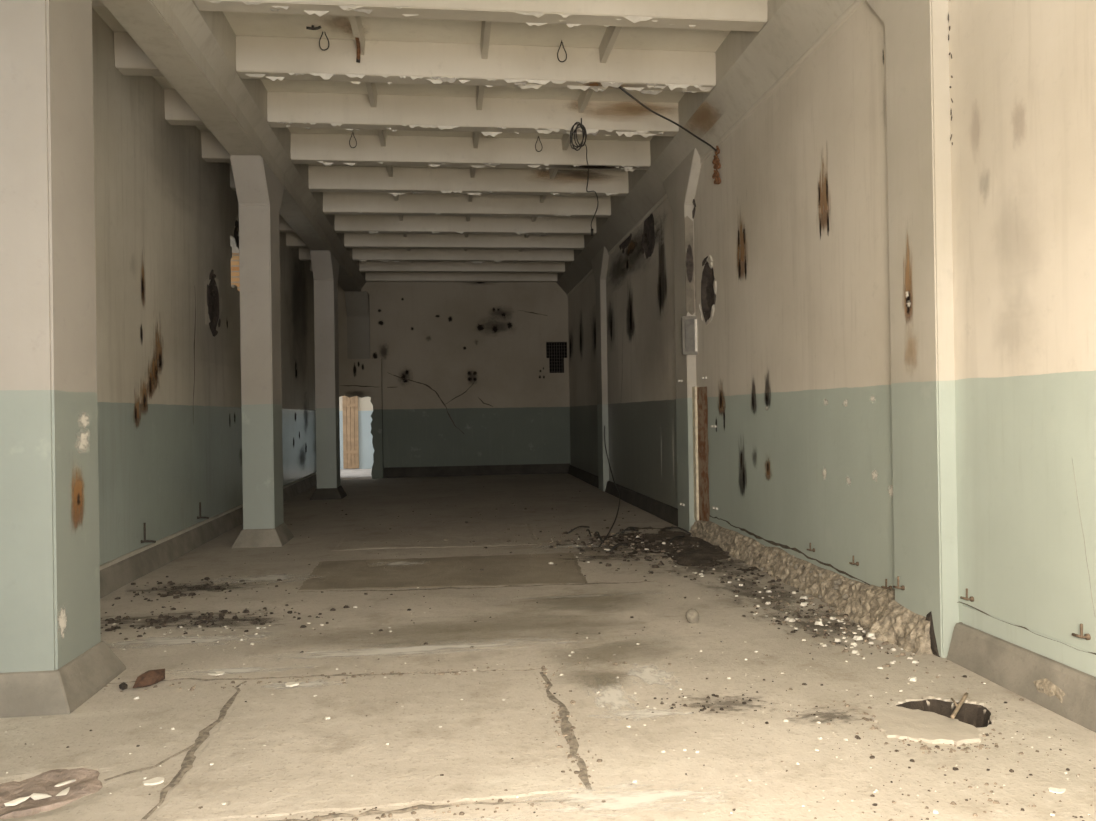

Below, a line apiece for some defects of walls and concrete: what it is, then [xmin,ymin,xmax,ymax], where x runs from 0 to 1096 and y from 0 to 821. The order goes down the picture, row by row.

rust [818,163,829,239]
spalling [207,269,221,337]
spalling [686,244,717,326]
rust [737,224,747,278]
rust [904,237,912,320]
rust [134,329,162,427]
rust [71,472,83,527]
crack [104,668,593,821]
spalling [896,699,992,728]